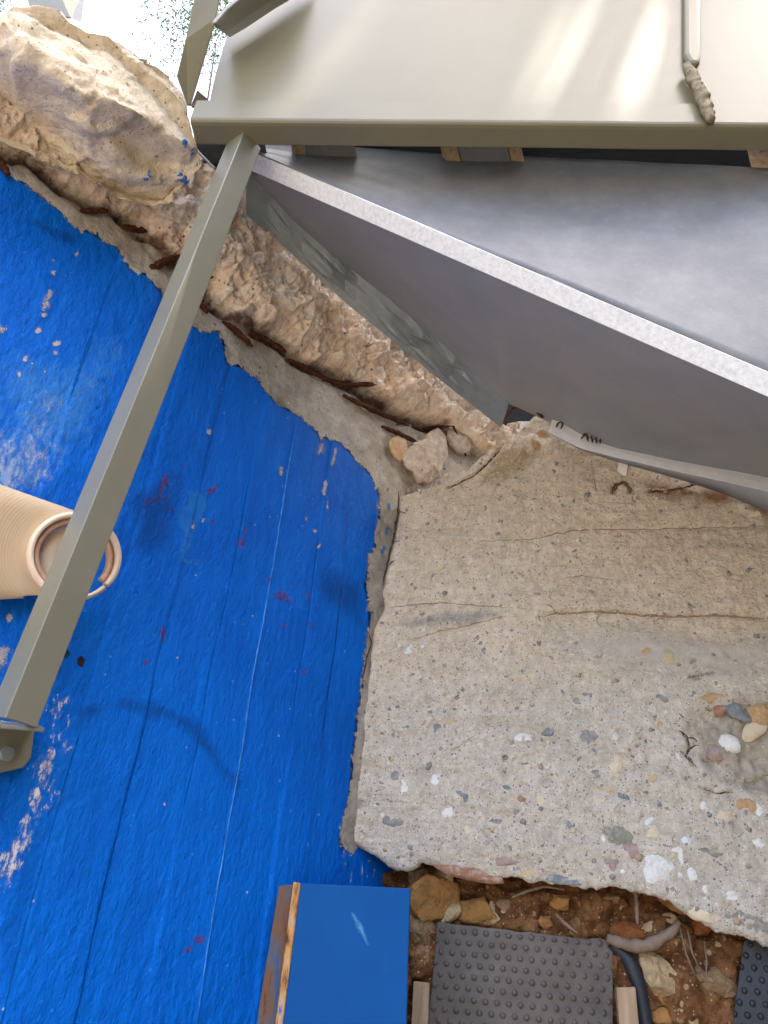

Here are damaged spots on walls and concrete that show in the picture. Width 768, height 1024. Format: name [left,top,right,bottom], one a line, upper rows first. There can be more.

spalling [0,96,217,295]
peeling [34,290,52,334]
peeling [0,424,49,487]
crack [382,491,506,640]
spalling [192,188,768,933]
crack [488,526,766,542]
crack [541,604,768,623]
peeling [0,734,70,883]